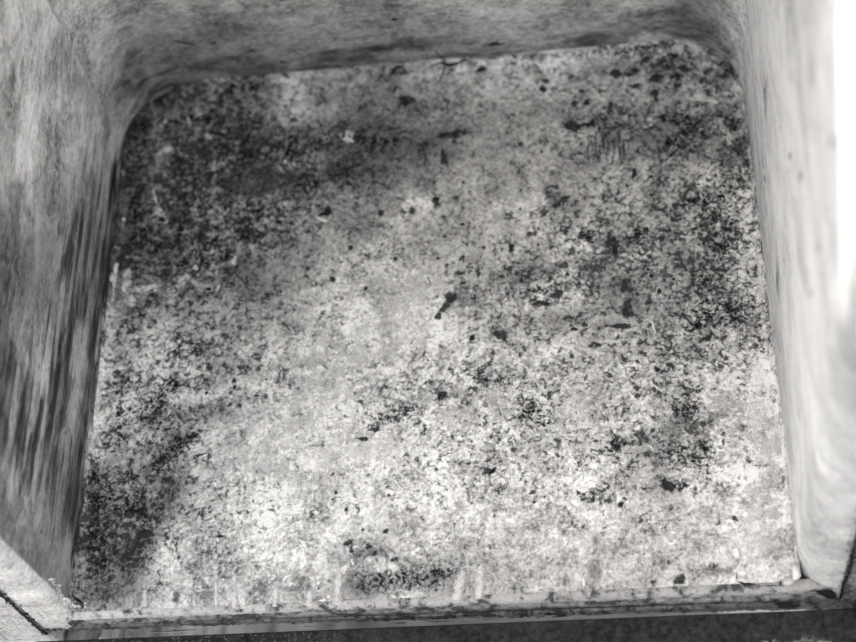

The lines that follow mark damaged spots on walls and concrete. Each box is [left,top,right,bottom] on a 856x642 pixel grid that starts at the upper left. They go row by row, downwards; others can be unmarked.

leakage [0,77,471,585]
leakage [489,175,570,232]
leakage [506,219,660,329]
leakage [563,59,770,360]
leakage [713,382,783,562]
leakage [673,569,689,584]